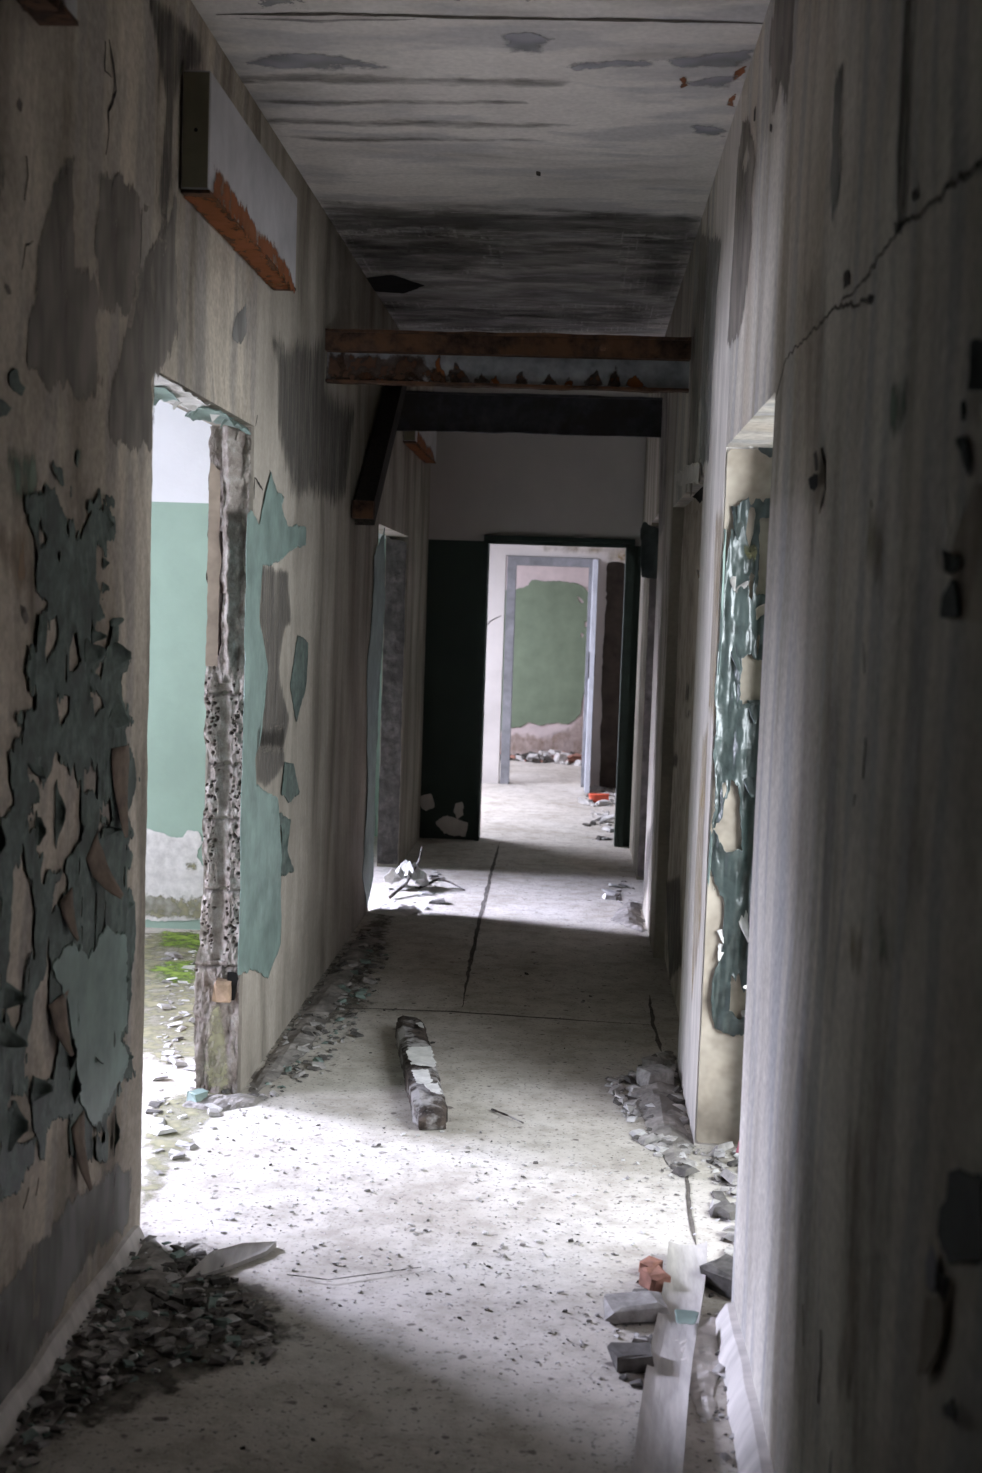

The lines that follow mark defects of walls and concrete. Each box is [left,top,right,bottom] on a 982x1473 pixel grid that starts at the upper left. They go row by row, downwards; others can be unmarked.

water stain [241,54,386,83]
water stain [504,33,548,52]
corrosion [184,171,295,293]
water stain [329,119,756,497]
crack [775,159,982,402]
water stain [658,393,668,537]
peeling [0,369,308,1202]
peeling [696,446,773,1145]
peeling [918,1168,982,1375]